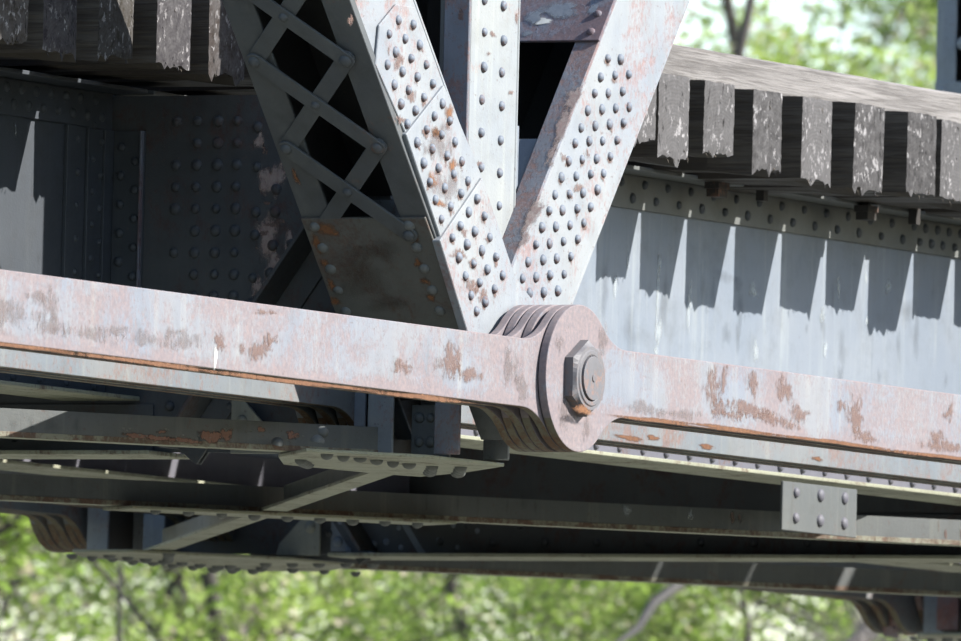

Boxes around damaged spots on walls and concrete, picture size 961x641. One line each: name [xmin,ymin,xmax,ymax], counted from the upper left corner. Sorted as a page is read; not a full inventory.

corrosion [240,333,278,360]
corrosion [436,342,483,382]
corrosion [617,366,961,460]